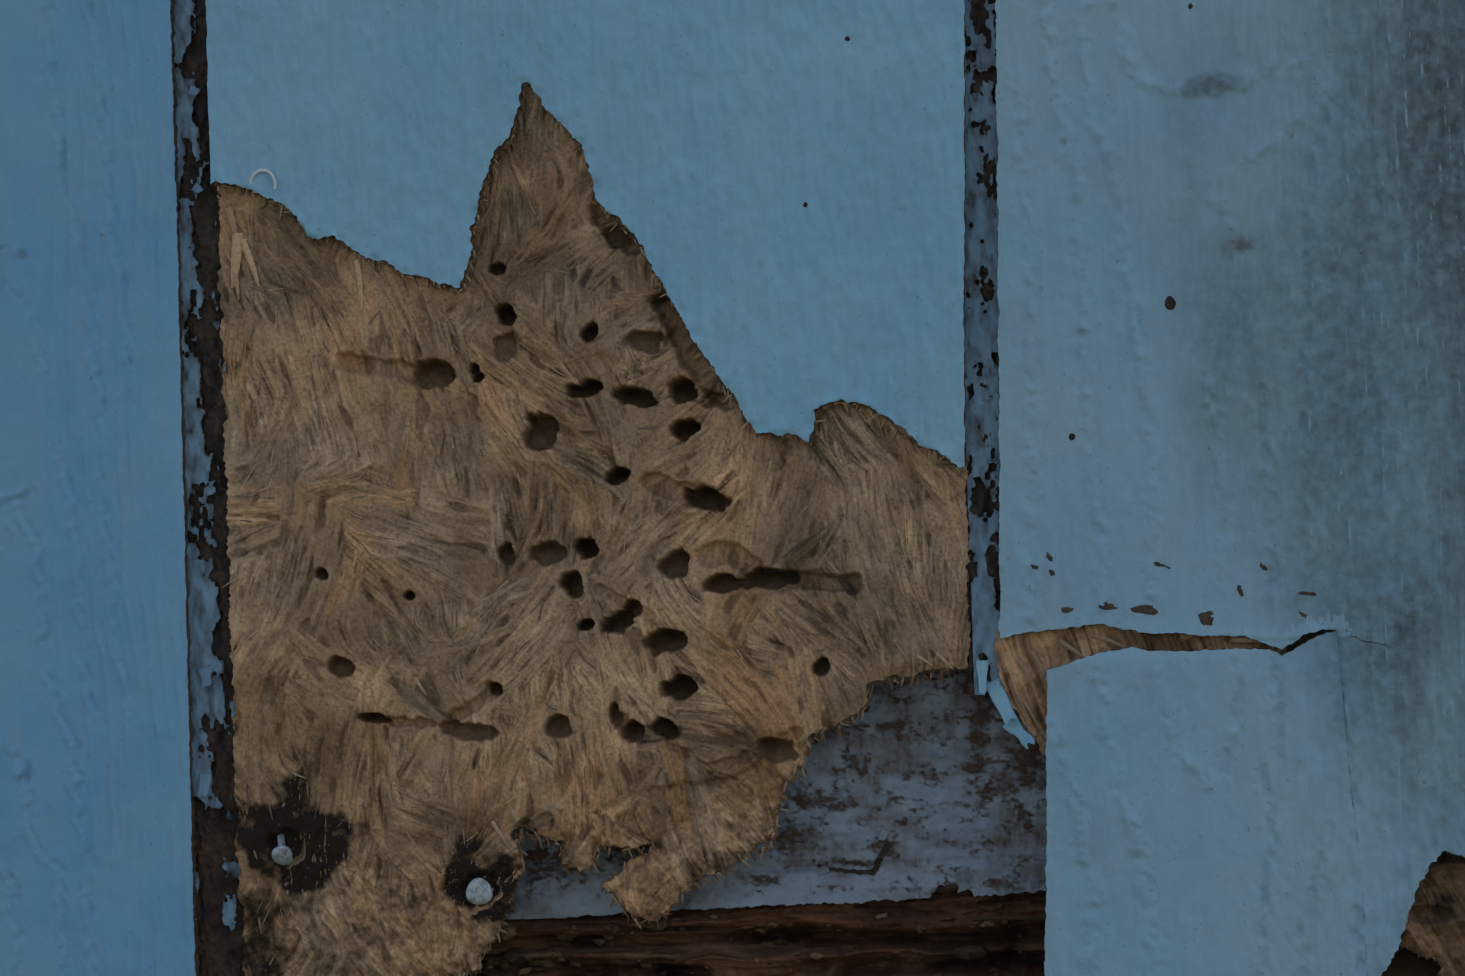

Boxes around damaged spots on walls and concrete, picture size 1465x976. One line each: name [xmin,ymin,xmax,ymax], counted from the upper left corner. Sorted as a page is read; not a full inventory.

peeling [173,0,1046,976]
crack [994,621,1391,755]
spalling [1381,851,1465,976]